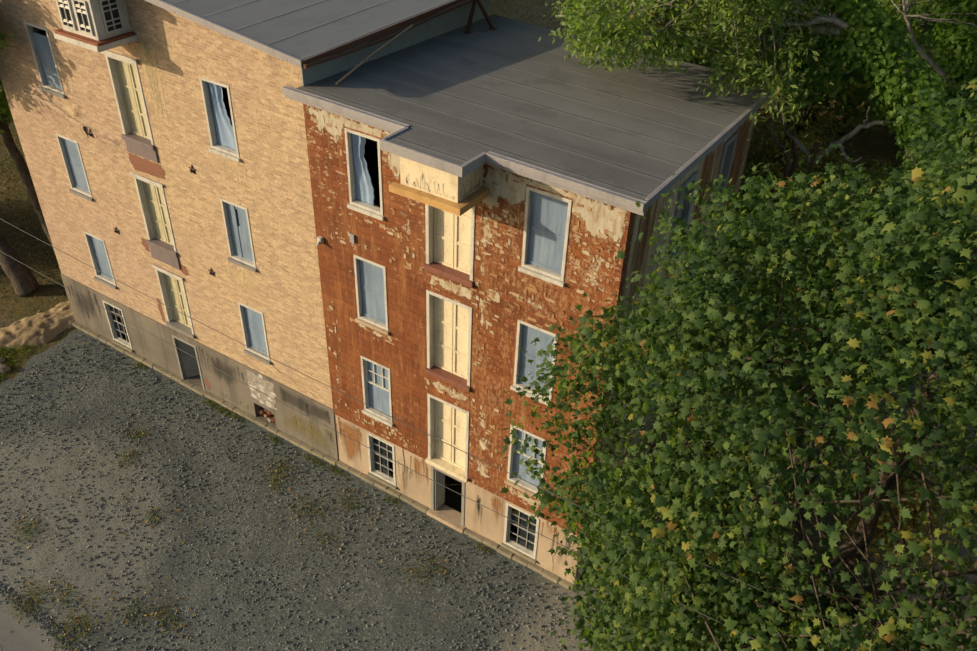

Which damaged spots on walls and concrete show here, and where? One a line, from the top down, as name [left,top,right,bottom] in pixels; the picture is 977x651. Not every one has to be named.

peeling [306,105,400,177]
peeling [364,166,627,366]
peeling [245,369,277,410]
leakage [281,391,331,437]
peeling [326,301,417,452]
peeling [424,378,503,485]
peeling [500,484,541,510]